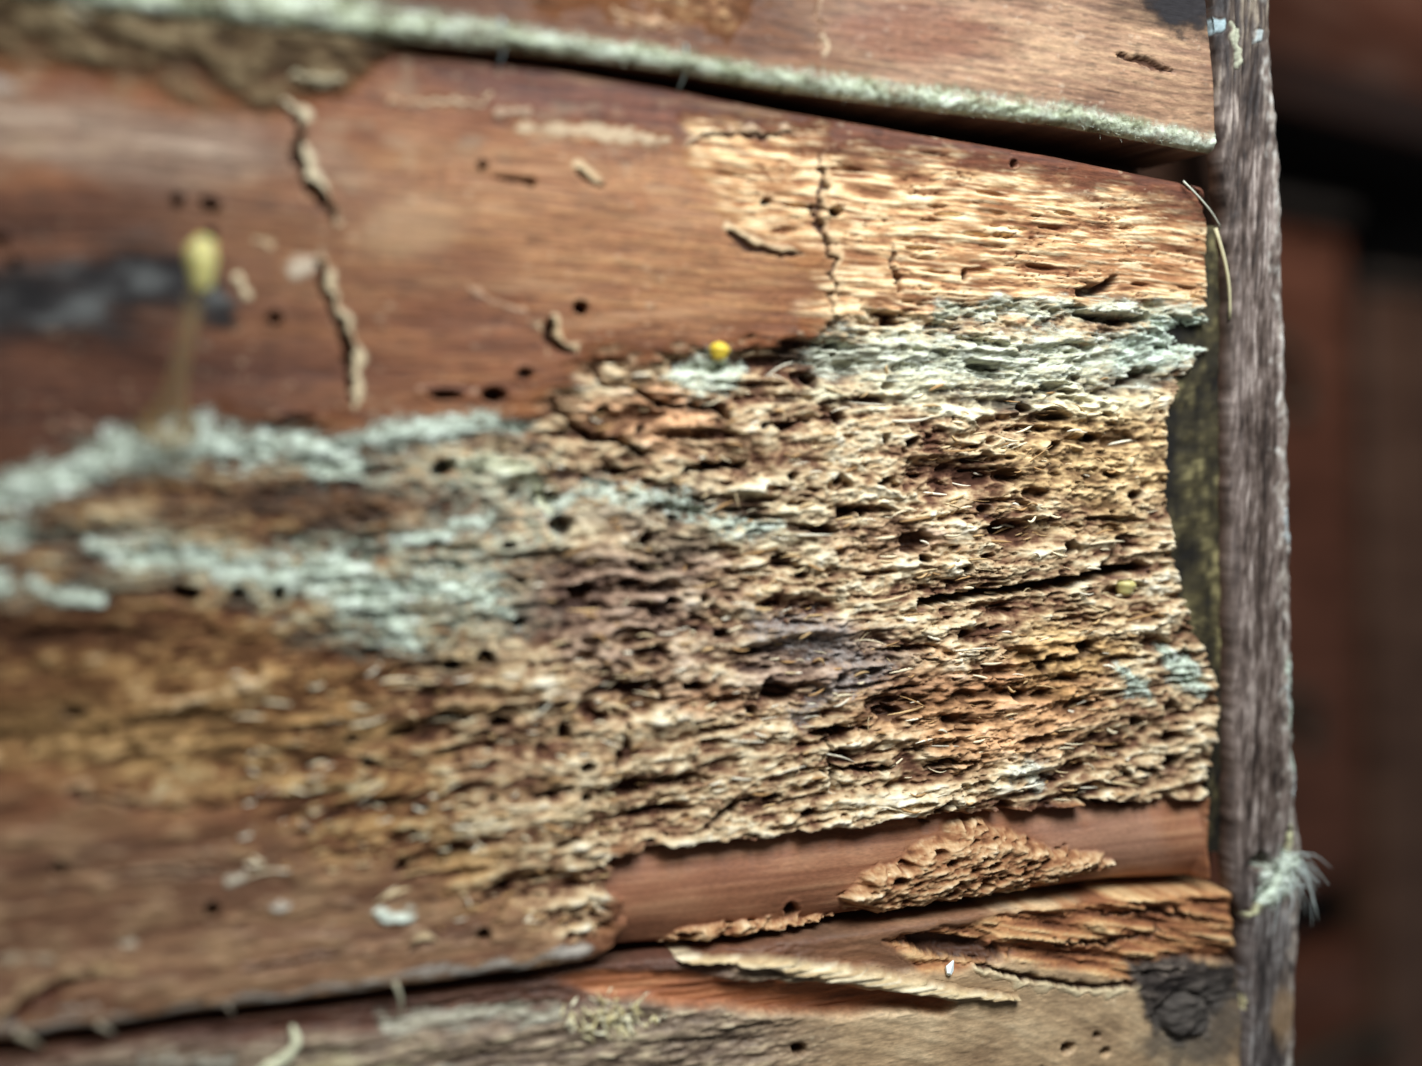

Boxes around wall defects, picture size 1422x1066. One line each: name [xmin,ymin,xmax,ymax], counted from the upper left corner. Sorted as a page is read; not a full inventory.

crack [815,0,831,58]
leakage [1138,0,1208,33]
leakage [512,118,674,149]
leakage [0,253,236,338]
crack [278,97,369,411]
leakage [661,349,748,401]
crack [683,120,847,314]
leakage [802,292,1209,391]
leakage [0,410,785,549]
leakage [0,572,106,606]
leakage [84,537,516,651]
spalling [877,892,1235,989]